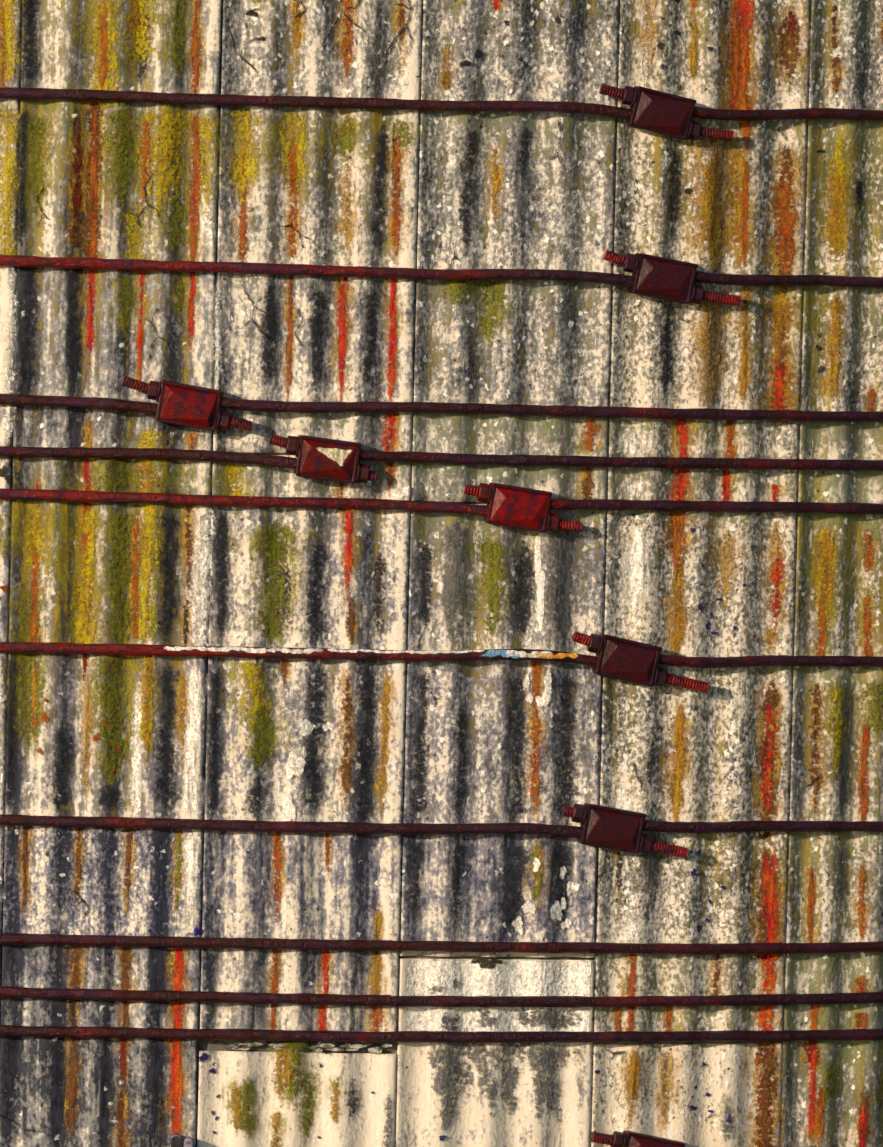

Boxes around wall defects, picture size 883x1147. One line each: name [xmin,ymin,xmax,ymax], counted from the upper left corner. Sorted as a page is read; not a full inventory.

damp [21,0,40,79]
damp [15,112,29,245]
rust [66,0,109,357]
rust [186,113,204,366]
rust [685,0,809,424]
damp [156,513,181,640]
rust [663,419,697,656]
damp [4,660,17,804]
damp [52,724,74,809]
damp [153,666,179,814]
rust [747,680,792,1147]
rust [165,948,187,1136]